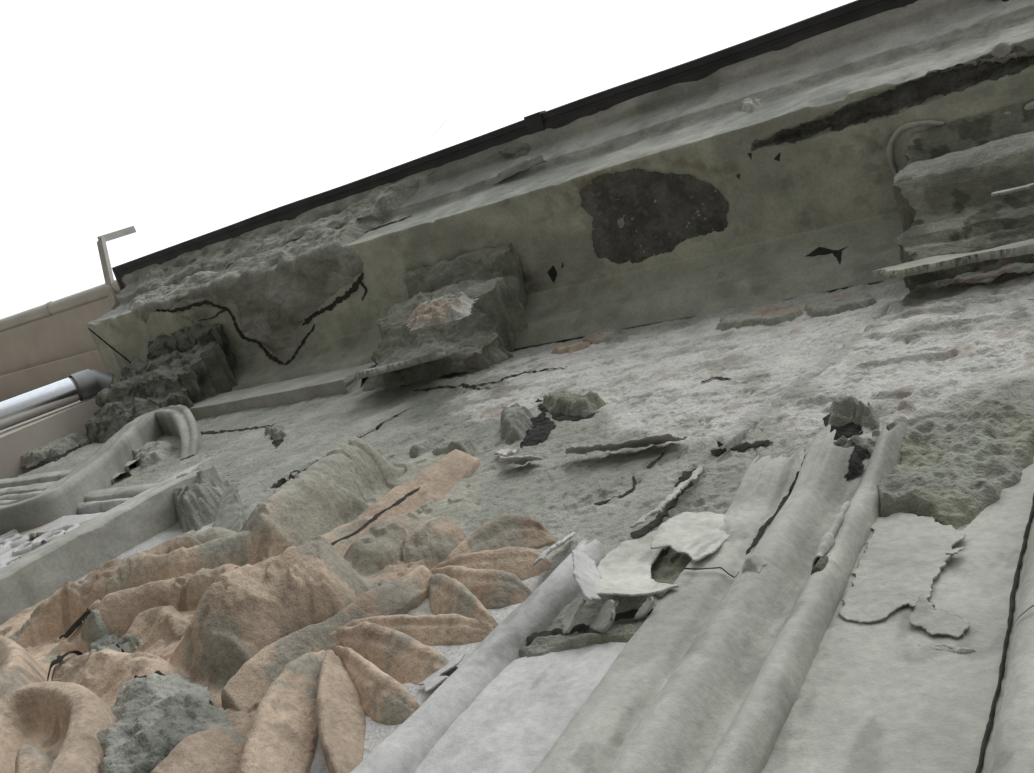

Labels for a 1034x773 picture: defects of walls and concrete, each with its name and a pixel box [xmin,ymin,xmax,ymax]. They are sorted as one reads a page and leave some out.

flaking render [748,41,1034,175]
flaking render [579,168,729,264]
crack [150,272,367,365]
flaking render [406,292,480,330]
crack [270,456,324,488]
crack [357,366,568,438]
peeling [565,433,688,454]
peeling [519,464,730,657]
peeling [811,501,850,575]
flaking render [823,395,1034,654]
flaking render [97,672,233,773]